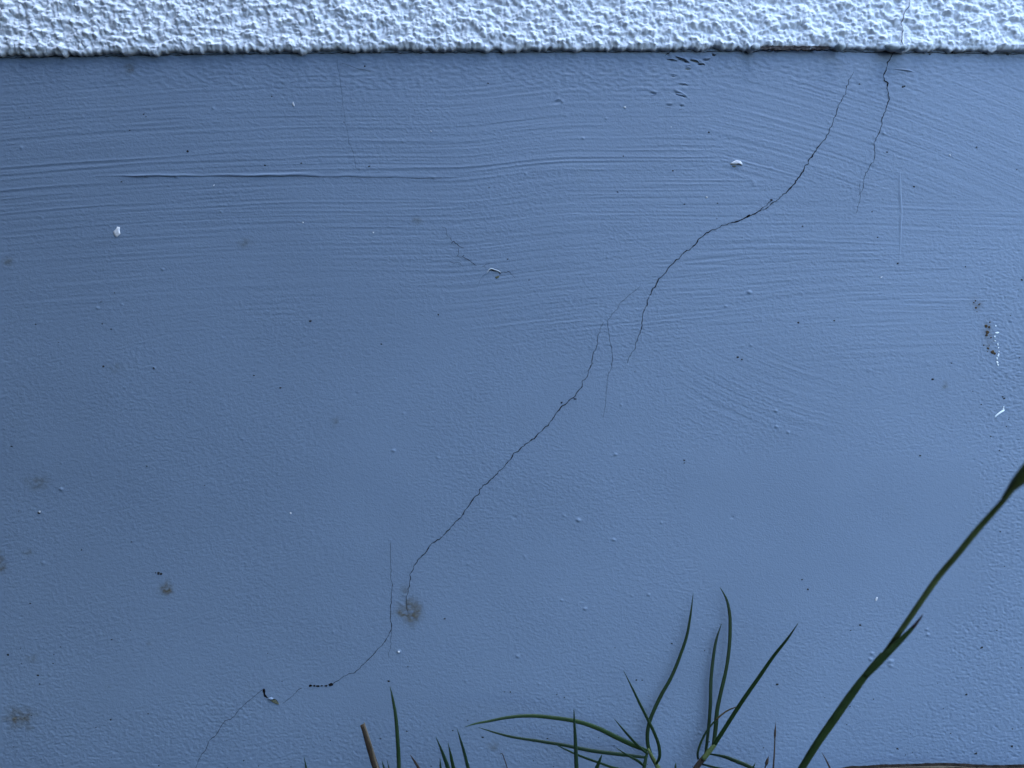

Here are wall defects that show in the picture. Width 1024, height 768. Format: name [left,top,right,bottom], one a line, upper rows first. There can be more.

crack [284,74,853,703]
crack [857,3,910,211]